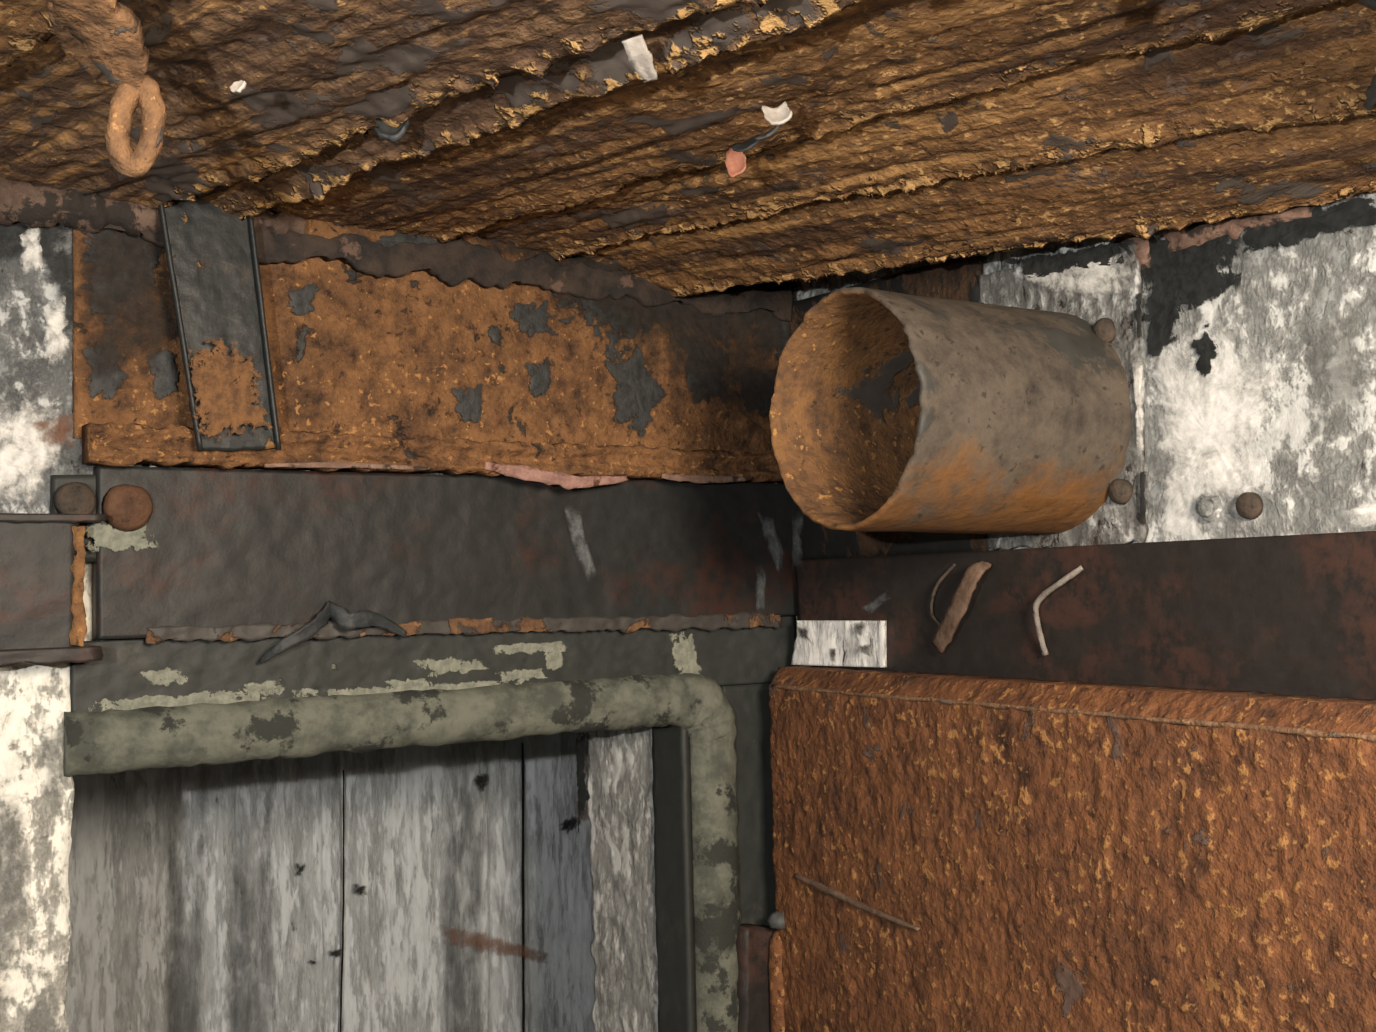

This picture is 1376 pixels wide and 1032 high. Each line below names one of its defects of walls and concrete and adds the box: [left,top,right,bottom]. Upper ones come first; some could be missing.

peeling [229,80,247,93]
peeling [622,34,657,82]
peeling [725,101,792,178]
peeling [287,281,319,316]
peeling [1005,197,1376,377]
corrosion [189,338,272,441]
peeling [452,383,484,423]
peeling [510,293,678,439]
peeling [88,641,567,712]
corrosion [144,611,781,645]
peeling [669,631,702,674]
peeling [560,732,590,833]